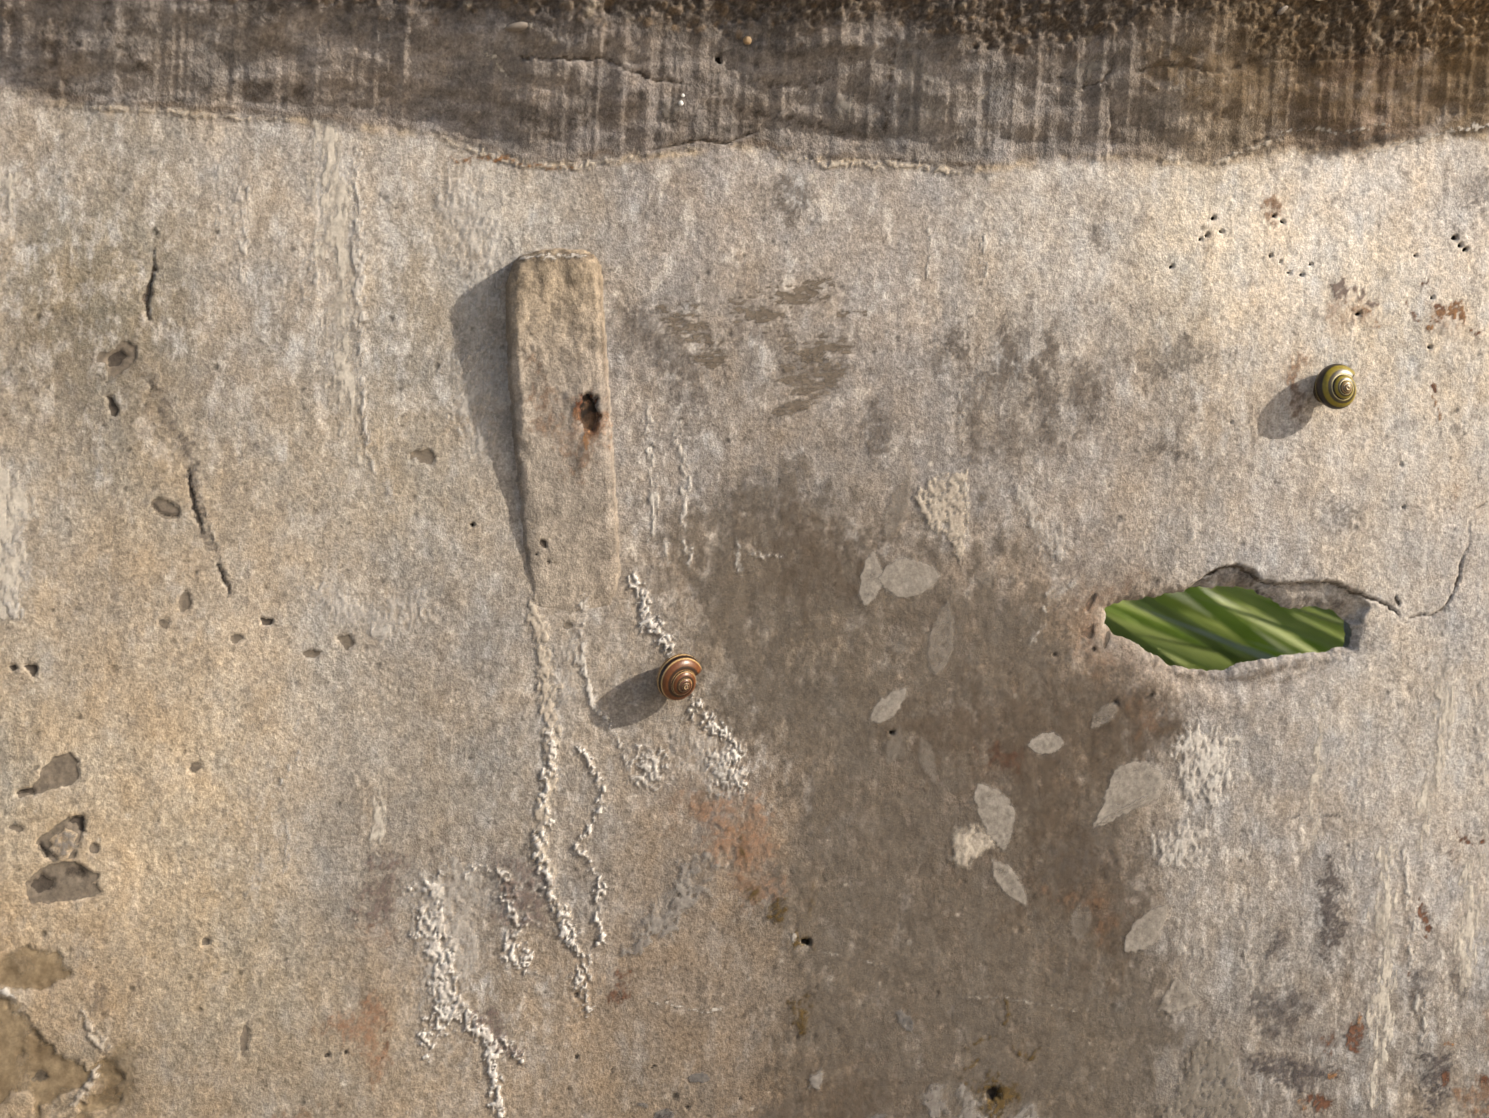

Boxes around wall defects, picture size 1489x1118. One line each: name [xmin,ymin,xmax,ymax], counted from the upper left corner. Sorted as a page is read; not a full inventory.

crack [142,267,157,320]
rust [573,394,605,450]
crack [152,377,231,597]
efflorescence [628,574,675,658]
crack [1184,564,1458,623]
leakage [642,406,1242,1118]
leakage [344,594,668,1118]
leakage [621,851,721,956]
peeling [0,945,130,1118]